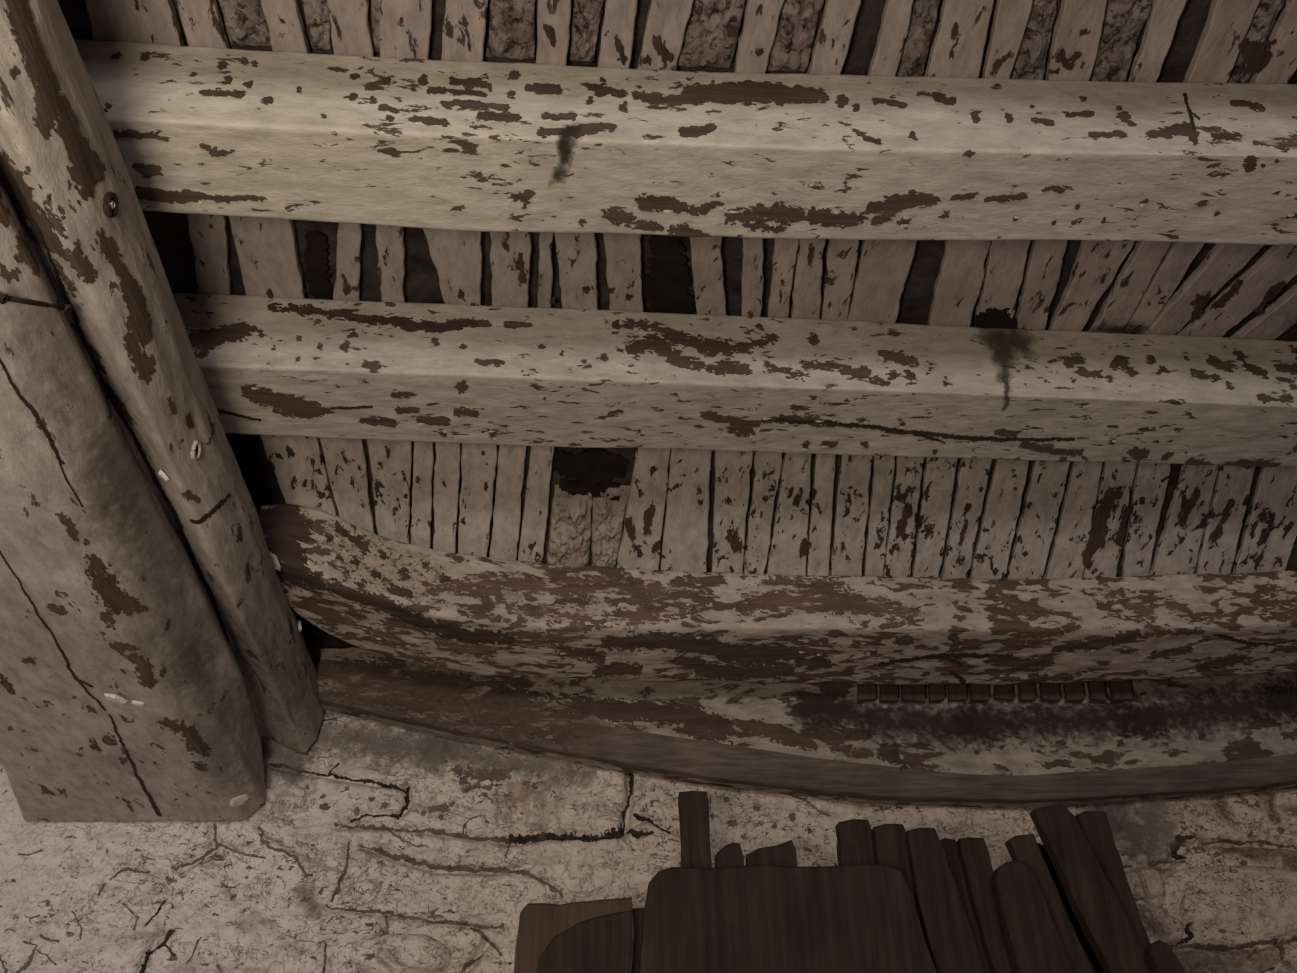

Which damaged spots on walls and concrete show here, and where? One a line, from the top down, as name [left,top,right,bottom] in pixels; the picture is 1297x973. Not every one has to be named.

peeling [348,70,563,127]
peeling [536,77,908,139]
water stain [553,126,580,181]
peeling [578,185,1065,237]
peeling [611,317,953,387]
water stain [980,328,1030,410]
peeling [258,503,921,756]
crack [789,795,831,816]
crack [180,763,671,973]
crack [1123,834,1297,901]
crack [0,867,202,973]
crack [1170,922,1297,973]